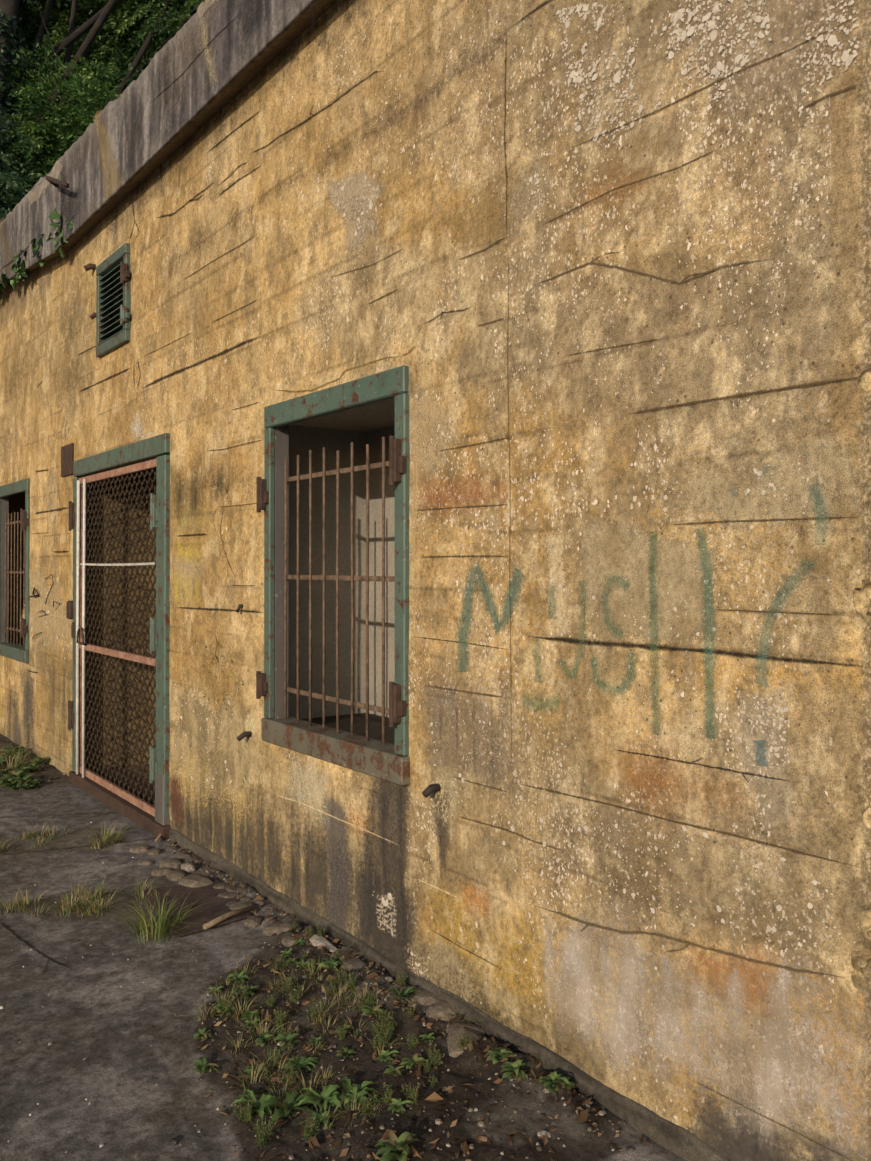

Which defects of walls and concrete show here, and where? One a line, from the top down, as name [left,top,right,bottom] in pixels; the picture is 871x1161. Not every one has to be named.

crack [540,252,768,285]
leakage [171,769,430,981]
spalling [452,691,871,1004]
leakage [547,916,865,1161]